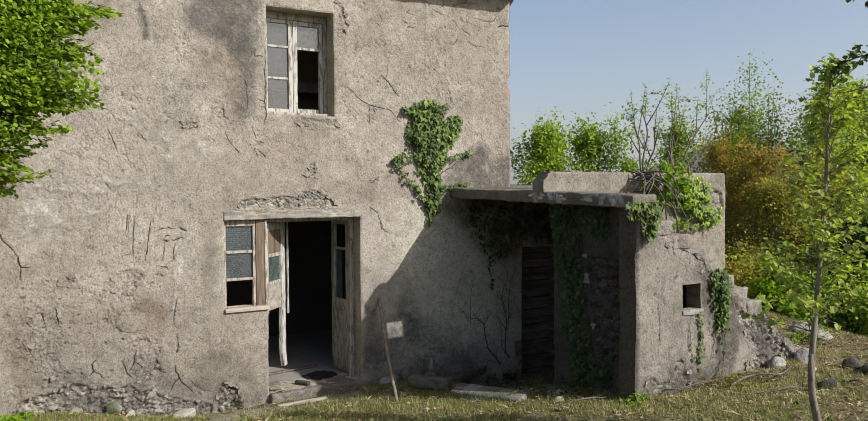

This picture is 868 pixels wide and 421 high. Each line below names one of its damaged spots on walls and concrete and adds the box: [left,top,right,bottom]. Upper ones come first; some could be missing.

spalling [238,190,339,210]
crack [0,234,29,279]
crack [126,215,187,270]
spalling [12,305,244,416]
crack [171,297,208,394]
spalling [735,305,792,370]